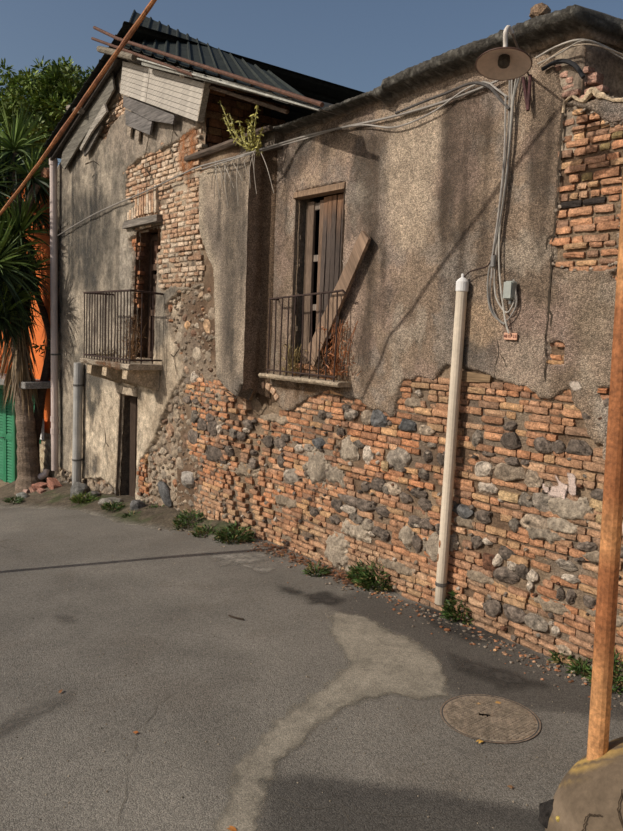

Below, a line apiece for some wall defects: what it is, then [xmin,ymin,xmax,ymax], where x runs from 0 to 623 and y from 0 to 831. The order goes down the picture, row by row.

damp [441,90,468,278]
crack [543,113,564,382]
spalling [549,64,623,279]
spalling [123,129,605,669]
spalling [614,519,623,662]